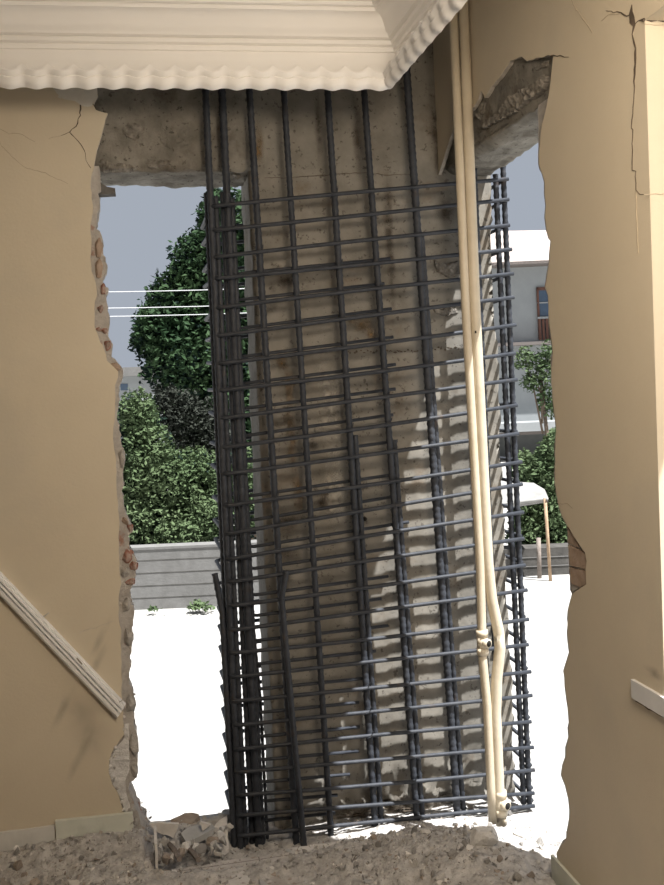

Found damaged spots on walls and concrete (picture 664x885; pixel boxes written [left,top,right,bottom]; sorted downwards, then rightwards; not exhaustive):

crack [0,104,96,184]
spalling [475,61,550,129]
crack [571,0,664,247]
flaking render [95,238,106,294]
flaking render [96,327,111,351]
flaking render [120,549,138,585]
flaking render [124,629,134,645]
spalling [109,693,139,827]